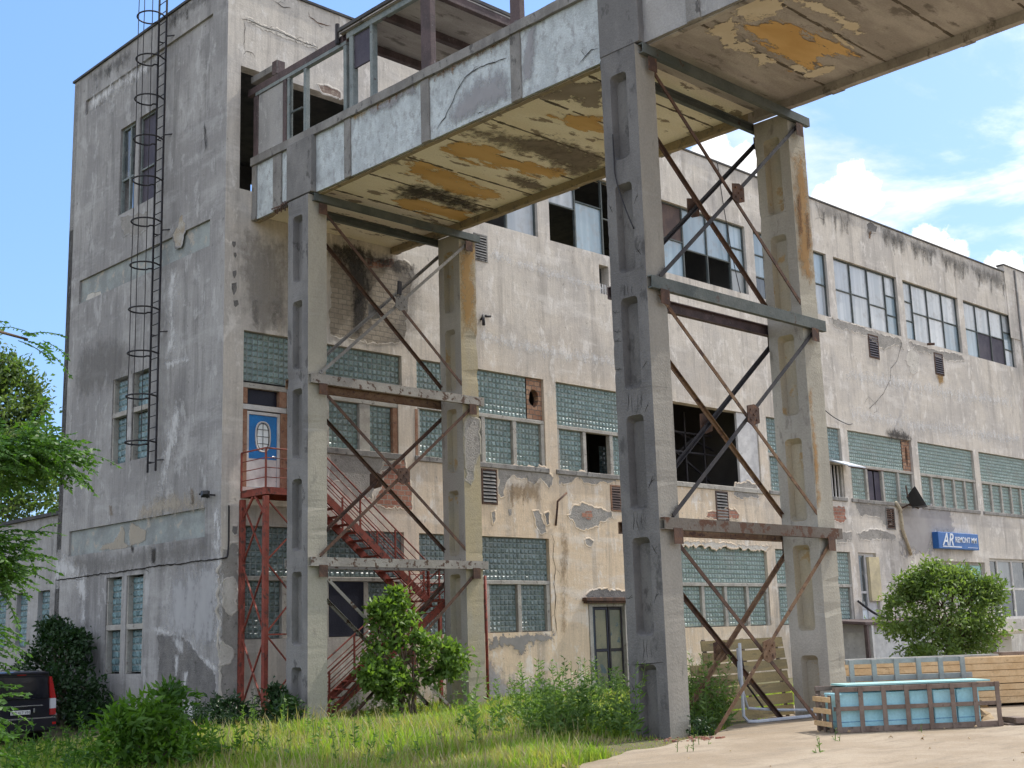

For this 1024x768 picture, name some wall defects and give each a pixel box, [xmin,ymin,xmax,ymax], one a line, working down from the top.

peeling [705,0,865,78]
crack [437,58,506,128]
peeling [540,81,604,133]
peeling [405,160,505,200]
peeling [440,141,566,180]
rust [794,156,813,278]
damp [328,244,414,335]
flaking render [463,415,481,485]
flaking render [490,464,617,526]
flaking render [567,501,614,548]
flaking render [155,524,239,721]
peeling [486,631,584,700]